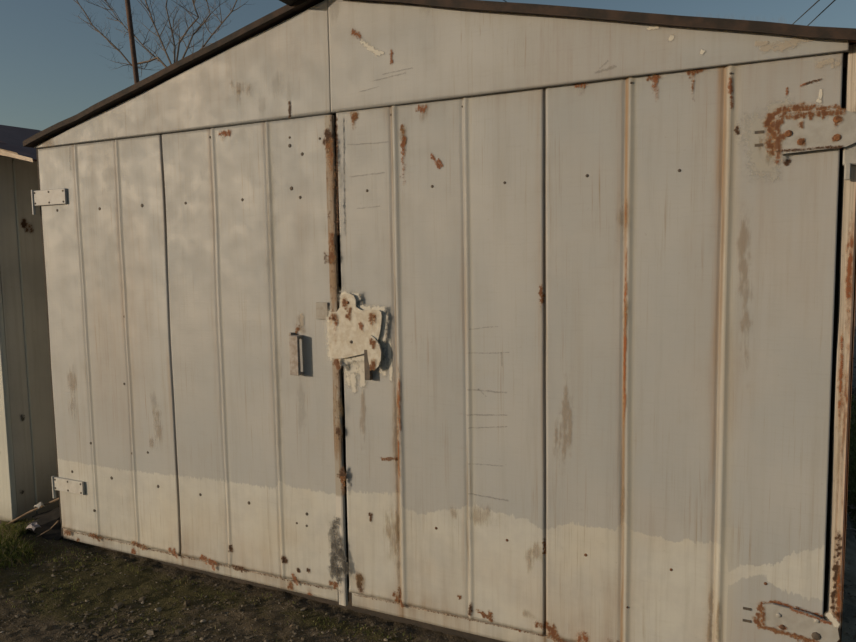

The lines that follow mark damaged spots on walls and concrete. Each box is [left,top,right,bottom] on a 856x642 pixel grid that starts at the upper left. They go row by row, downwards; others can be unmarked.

rust [764,103,846,166]
rust [323,117,339,264]
rust [845,236,854,299]
peeling [325,309,367,393]
peeling [339,290,393,382]
rust [356,574,406,608]
rust [423,595,564,642]
rust [753,534,842,642]